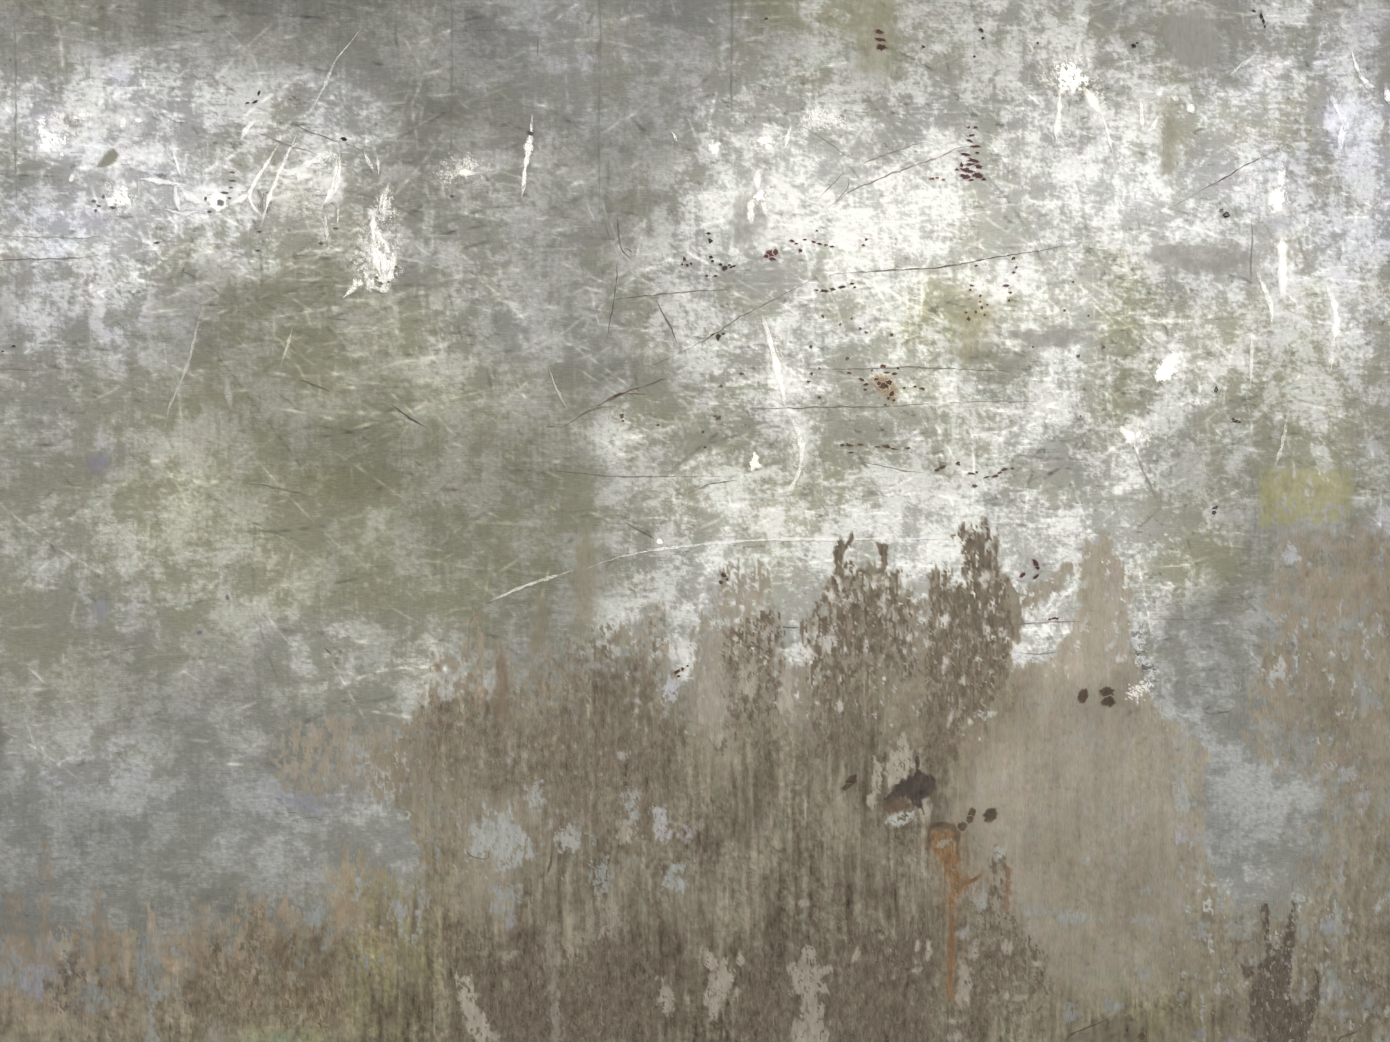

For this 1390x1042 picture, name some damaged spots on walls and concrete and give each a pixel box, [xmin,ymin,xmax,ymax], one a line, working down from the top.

water stain [467,512,948,725]
water stain [841,773,858,791]
water stain [880,752,999,833]
corrosion [912,809,1015,1014]
water stain [1239,899,1324,1042]